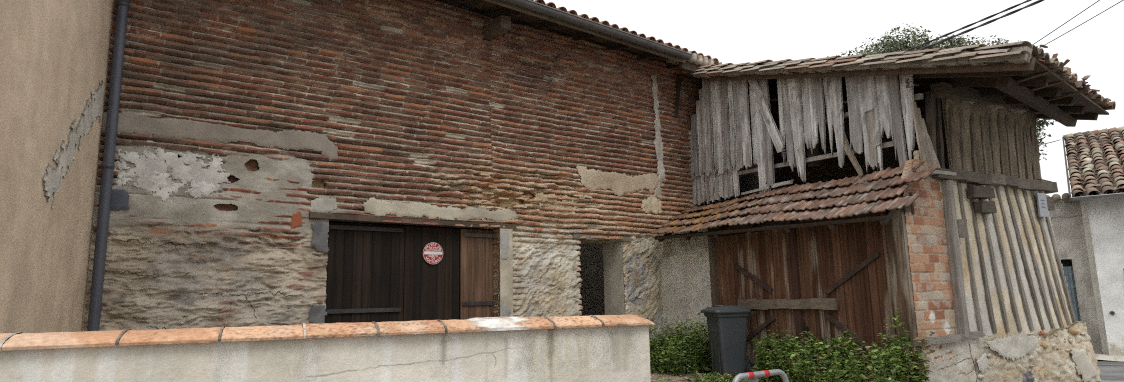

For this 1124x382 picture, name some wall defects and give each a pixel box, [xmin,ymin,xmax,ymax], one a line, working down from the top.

peeling [114,137,258,211]